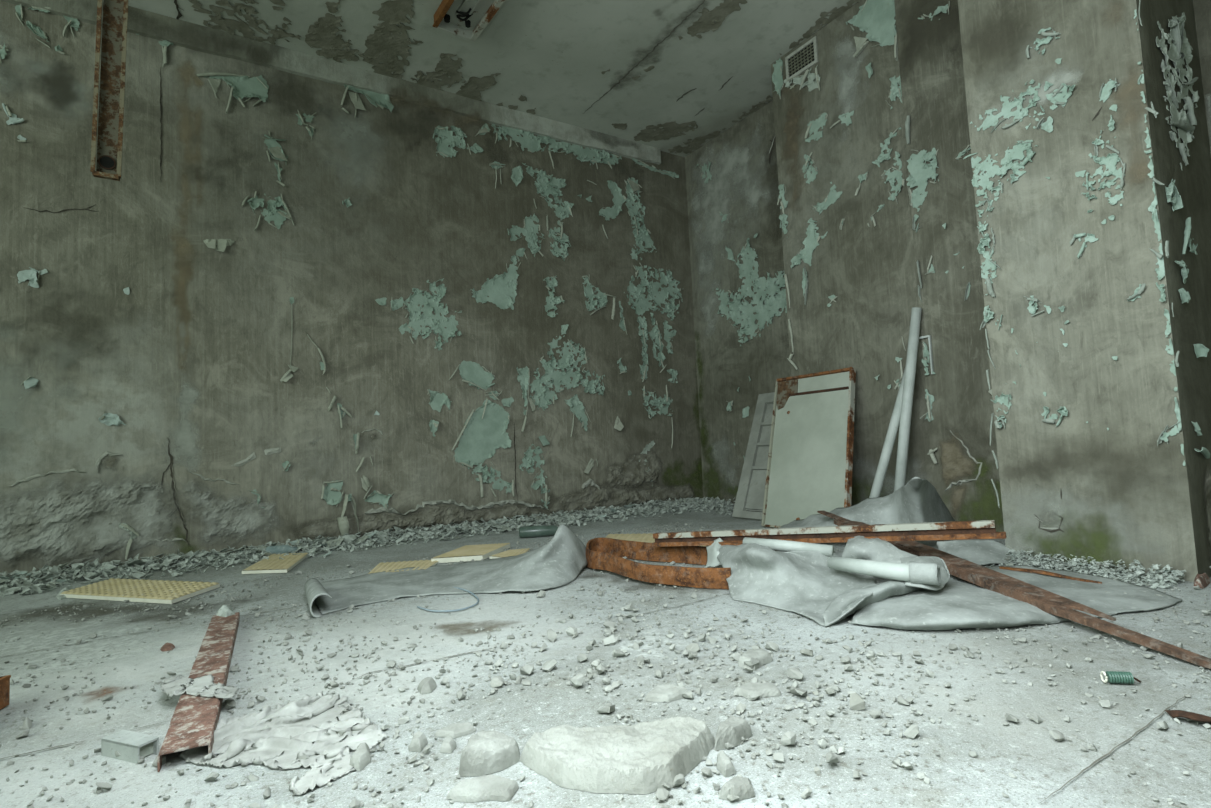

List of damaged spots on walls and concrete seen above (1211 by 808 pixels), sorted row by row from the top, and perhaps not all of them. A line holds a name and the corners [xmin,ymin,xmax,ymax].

peeling [17,267,48,288]
crack [23,205,98,213]
crack [157,67,165,176]
peeling [188,0,501,101]
peeling [433,123,683,449]
peeling [611,0,898,184]
peeling [713,76,939,370]
peeling [927,79,1075,516]
peeling [1069,78,1126,258]
peeling [1126,13,1211,568]
crack [161,439,189,546]
flaking render [0,275,735,598]